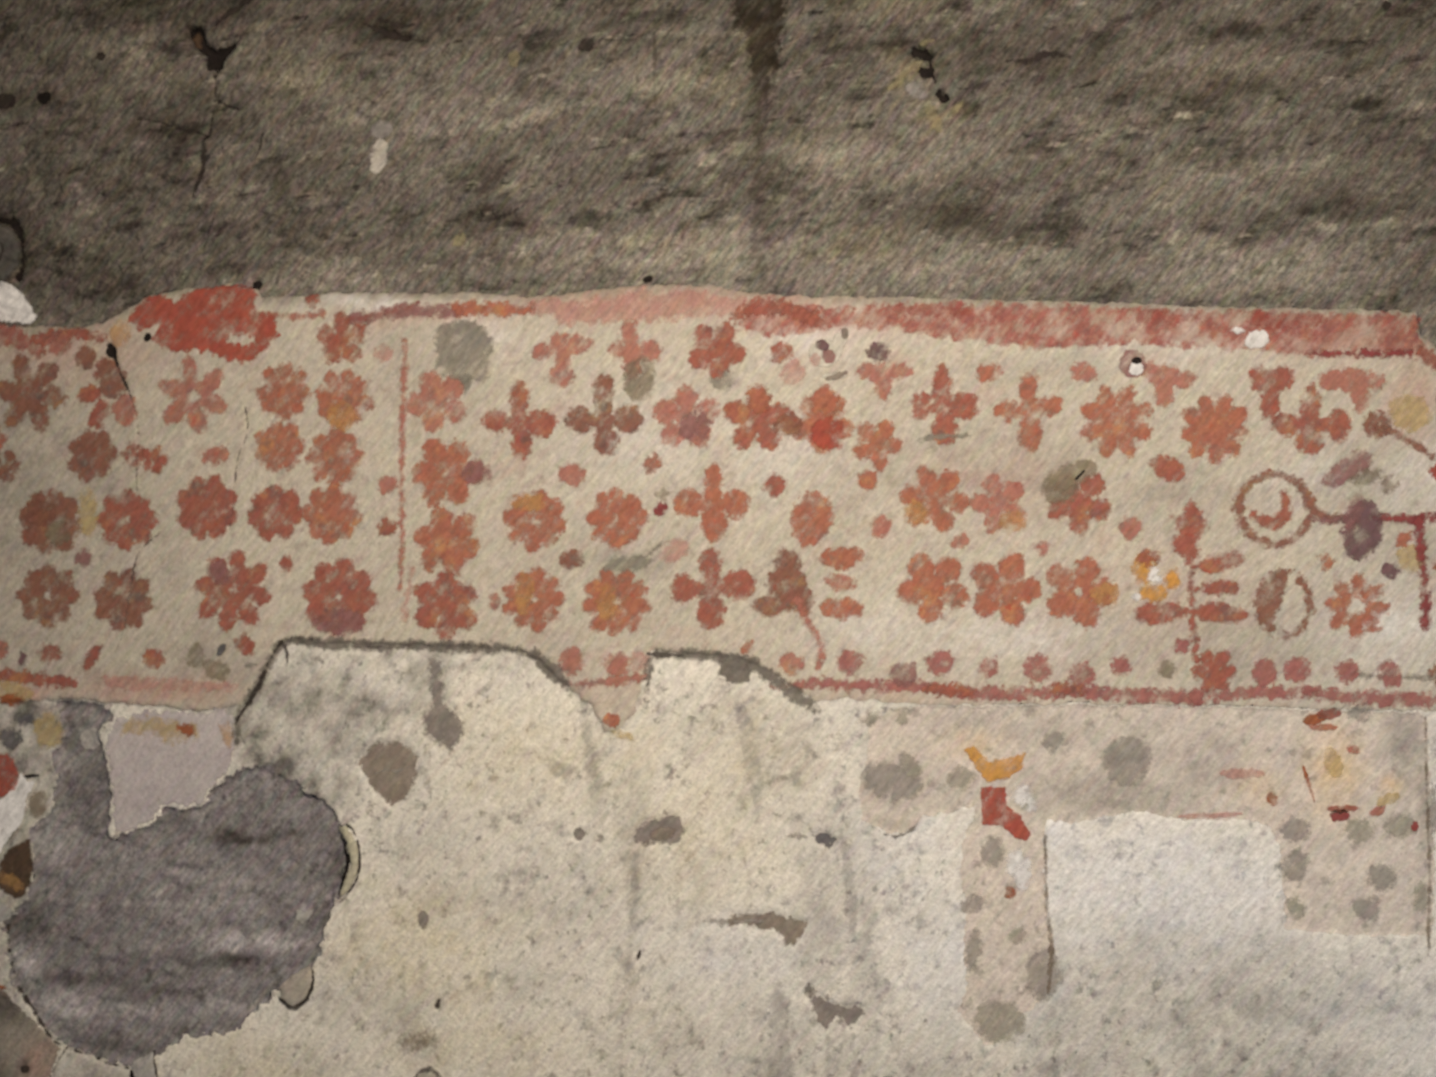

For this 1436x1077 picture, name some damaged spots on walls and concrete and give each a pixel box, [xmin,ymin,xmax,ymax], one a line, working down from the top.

crack [215,0,251,26]
water stain [733,0,785,88]
crack [137,75,264,243]
peeling [232,636,570,750]
peeling [644,648,820,713]
spalling [359,741,418,806]
spalling [574,828,585,840]
spalling [634,815,684,847]
spalling [790,833,837,848]
spalling [0,700,361,1077]
spalling [719,911,807,945]
spalling [805,983,865,1028]